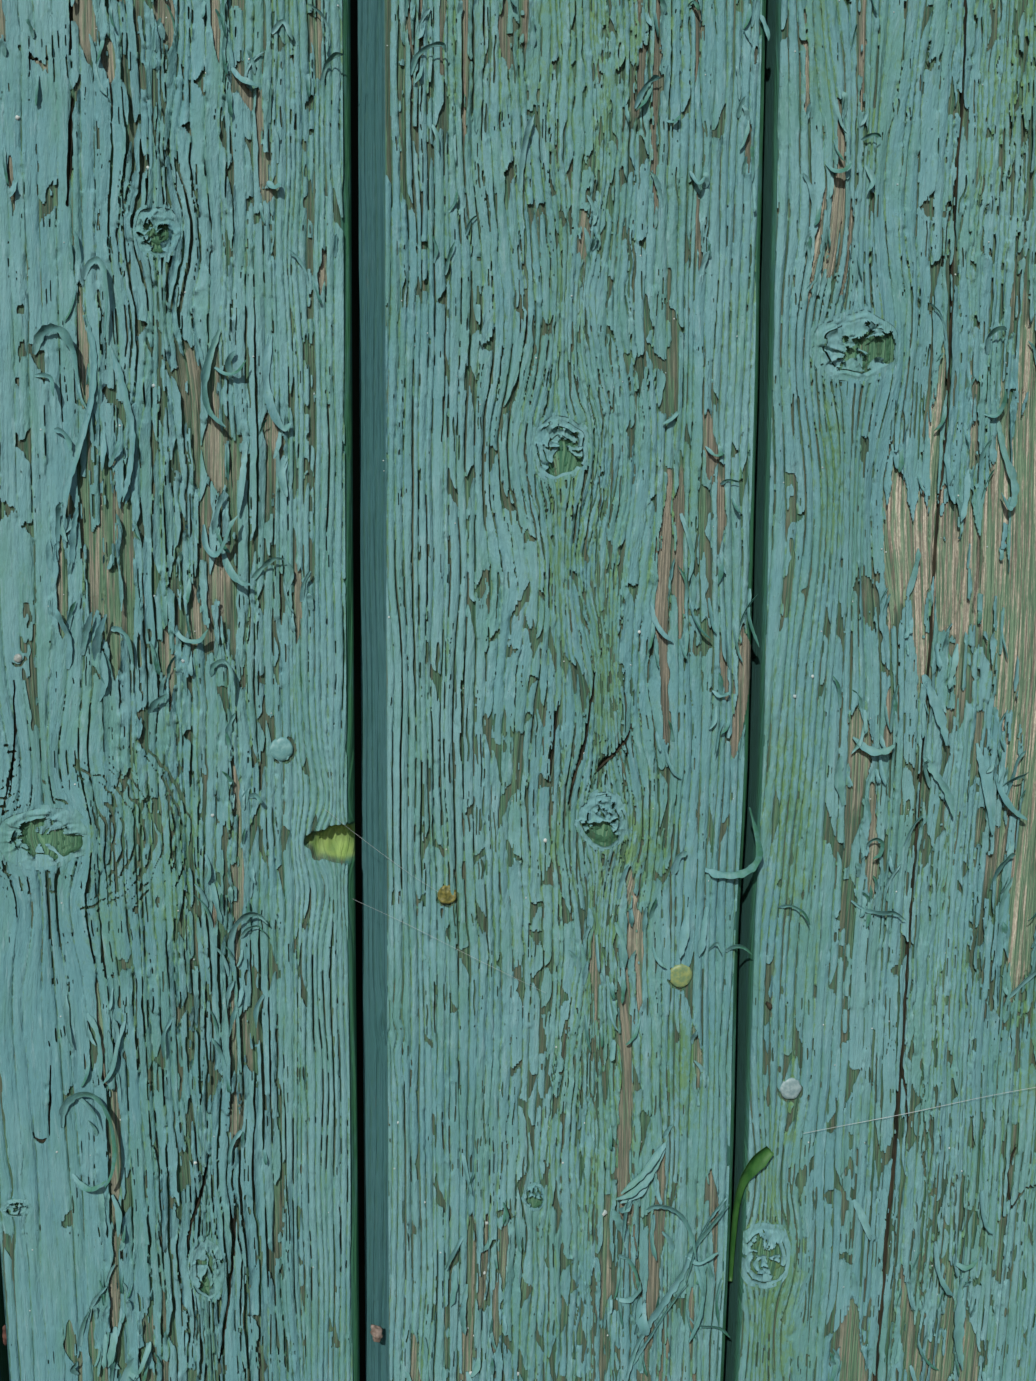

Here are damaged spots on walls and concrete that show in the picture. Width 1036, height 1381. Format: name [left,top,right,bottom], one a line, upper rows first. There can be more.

peeling [201,0,282,223]
peeling [404,0,479,162]
peeling [32,231,314,1164]
peeling [648,447,759,779]
peeling [832,675,923,928]
crack [874,0,967,1381]
peeling [880,303,1036,1002]
peeling [59,980,162,1381]
peeling [405,1153,522,1381]
peeling [568,865,753,1381]
peeling [894,1242,990,1381]
crack [1002,1147,1031,1216]